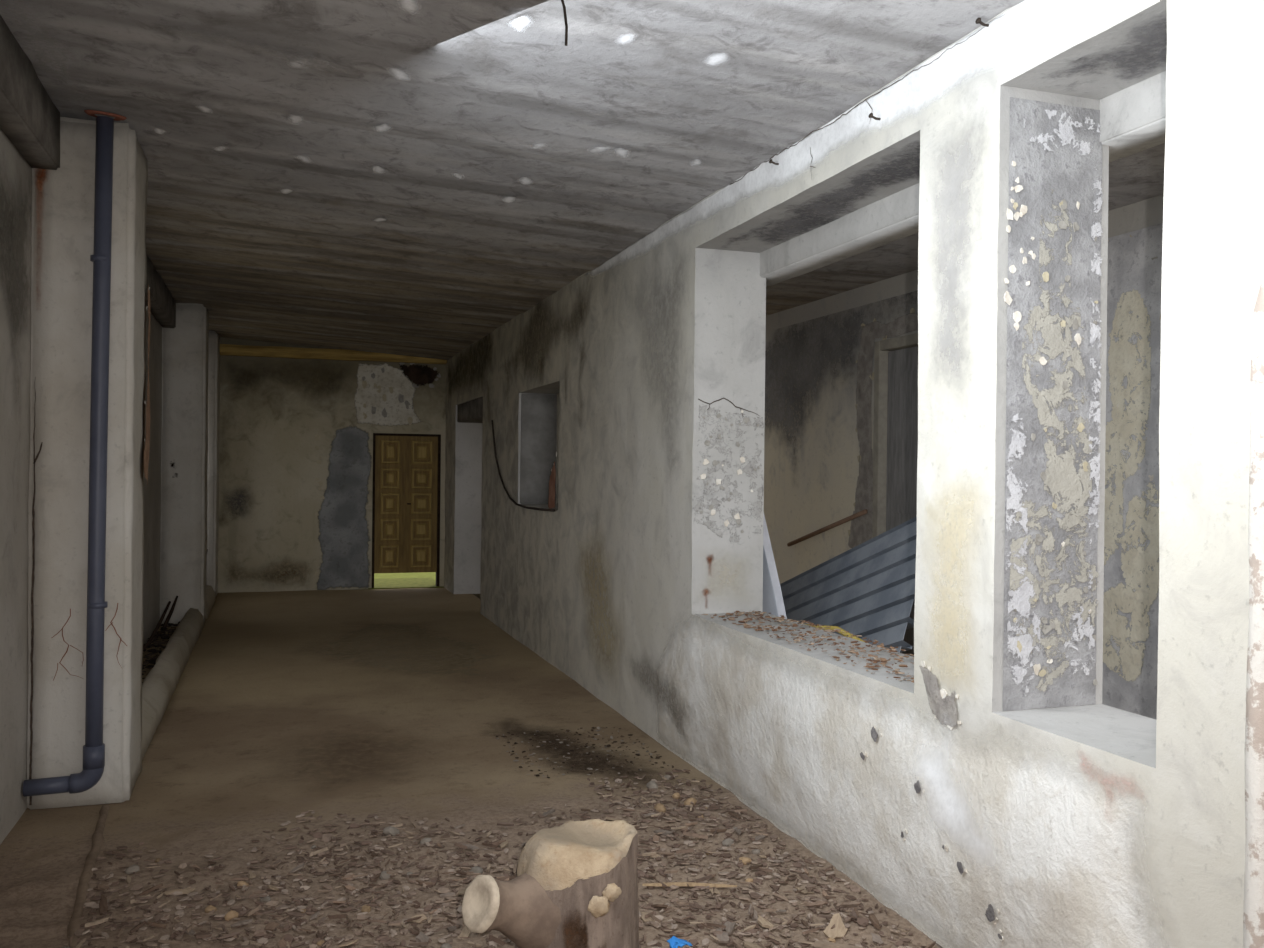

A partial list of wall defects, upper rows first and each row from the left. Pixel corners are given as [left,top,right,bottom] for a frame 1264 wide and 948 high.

peeling [354,362,441,427]
peeling [693,405,764,545]
leakage [765,307,869,441]
peeling [1002,97,1163,719]
crack [105,603,127,668]
spalling [920,661,961,730]